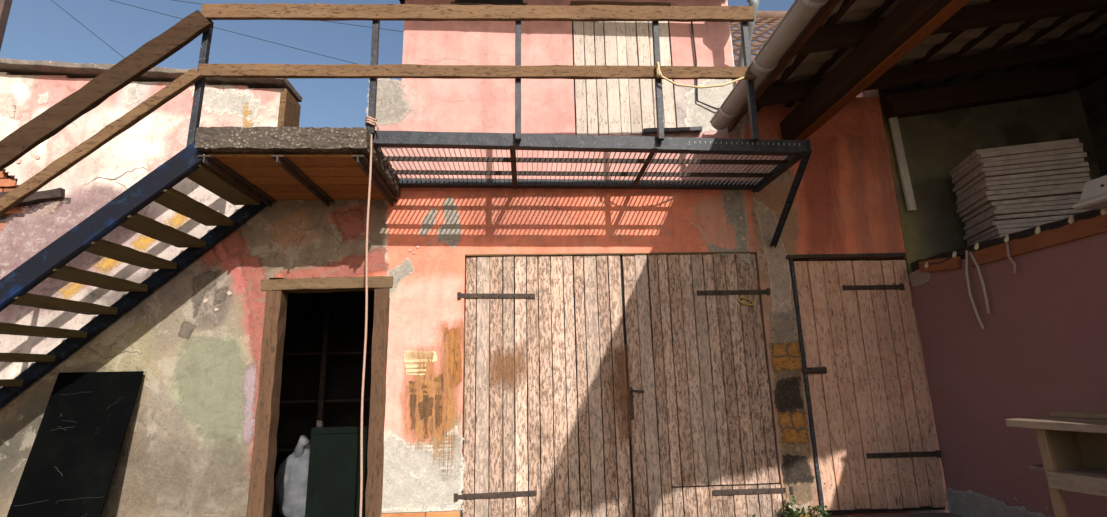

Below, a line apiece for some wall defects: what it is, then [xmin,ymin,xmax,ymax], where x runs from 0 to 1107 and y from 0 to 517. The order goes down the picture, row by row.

peeling [0,95,33,126]
peeling [366,78,412,125]
peeling [35,130,75,165]
peeling [147,120,202,172]
spalling [0,170,18,198]
spalling [0,188,69,231]
peeling [283,195,462,298]
peeling [178,231,266,443]
peeling [382,426,466,512]